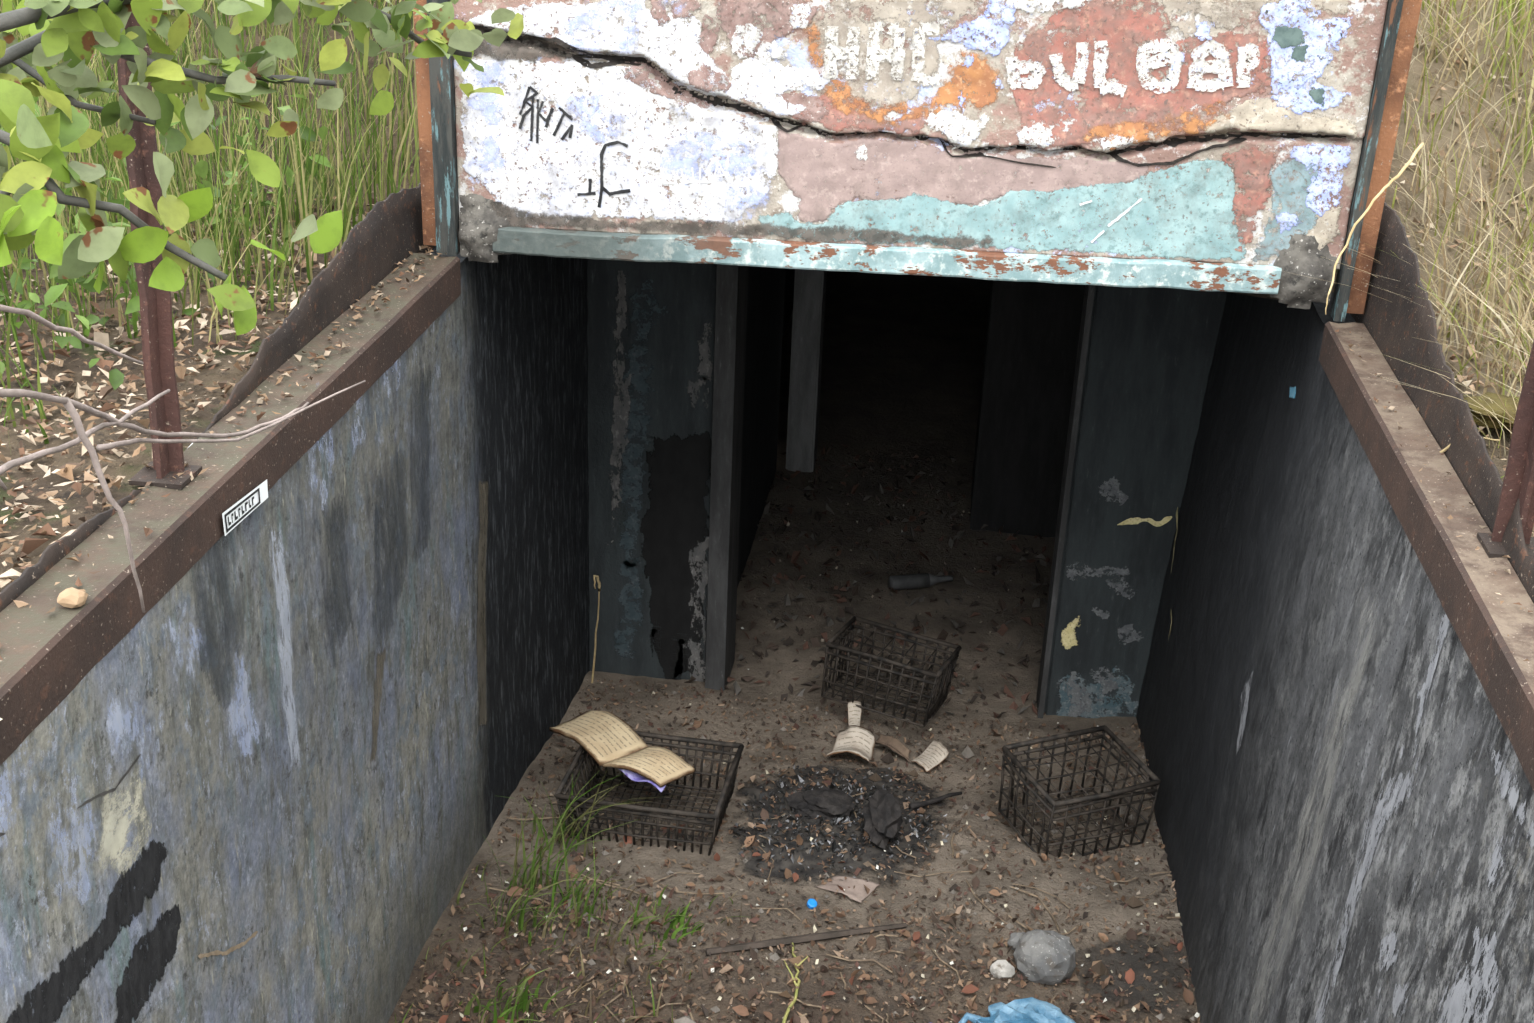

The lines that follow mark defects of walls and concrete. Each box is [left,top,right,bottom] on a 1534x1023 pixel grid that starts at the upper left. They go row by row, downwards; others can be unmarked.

peeling [460,0,1359,234]
crack [484,26,1346,168]
peeling [1098,476,1129,506]
peeling [1056,666,1139,718]
peeling [1066,561,1135,600]
peeling [1092,607,1143,645]
water stain [1249,600,1379,1023]
water stain [1314,614,1450,1023]